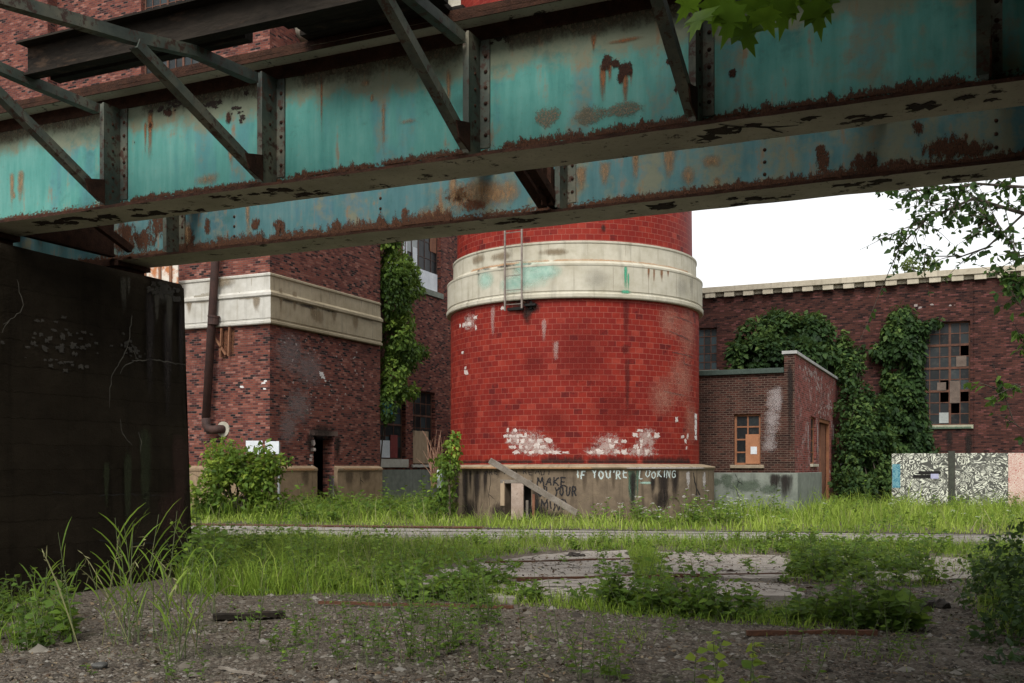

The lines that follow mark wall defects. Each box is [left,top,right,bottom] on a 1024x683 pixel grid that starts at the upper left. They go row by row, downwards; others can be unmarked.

rust [502,54,691,148]
rust [731,72,966,116]
rust [294,148,464,179]
rust [616,120,1024,202]
peeling [32,208,206,226]
peeling [209,188,330,201]
rust [179,179,516,251]
crack [109,318,189,451]
peeling [503,428,569,455]
peeling [587,429,660,456]
leakage [455,458,706,510]
leakage [770,475,792,494]